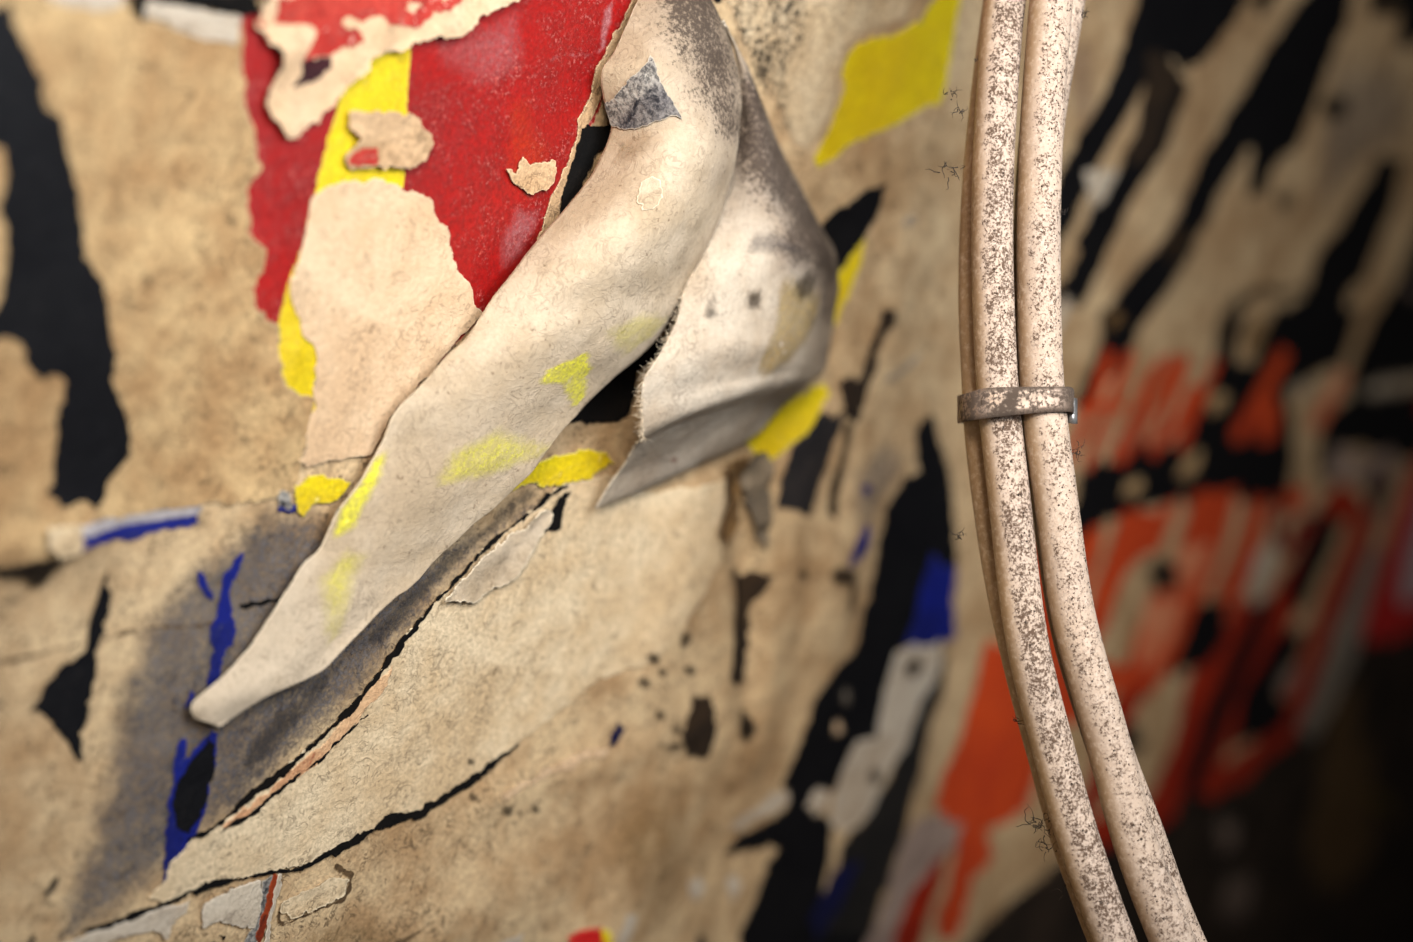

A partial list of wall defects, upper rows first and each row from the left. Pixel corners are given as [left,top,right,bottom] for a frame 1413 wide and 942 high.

peeling [191,0,839,727]
crack [0,595,282,664]
crack [81,743,519,933]
crack [187,484,571,841]